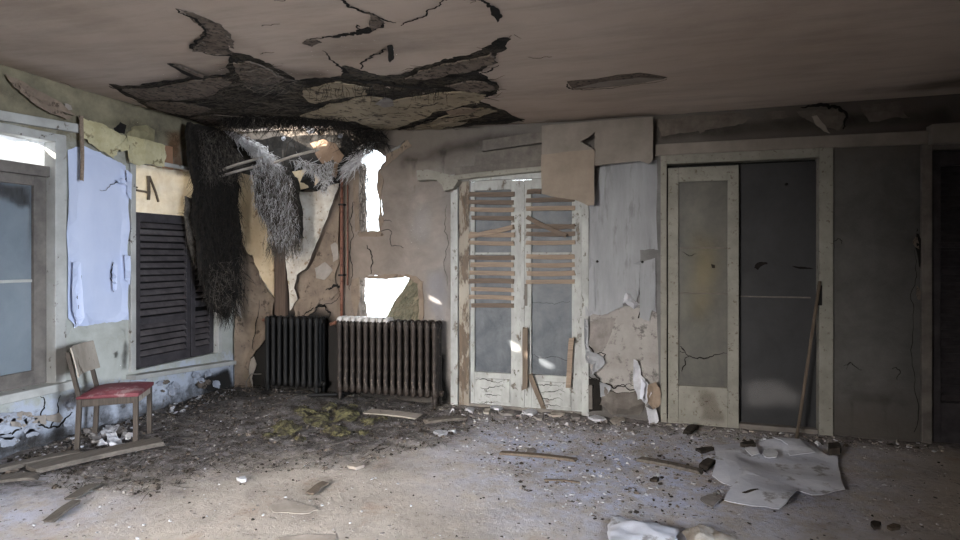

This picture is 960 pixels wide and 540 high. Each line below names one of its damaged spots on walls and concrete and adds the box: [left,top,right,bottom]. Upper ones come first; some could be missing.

crack [302,0,447,73]
crack [472,0,502,22]
spalling [109,8,525,237]
flaking render [766,103,848,133]
flaking render [293,206,424,321]
flaking render [234,244,274,388]
crack [0,395,73,436]
peeling [0,401,76,448]
spalling [439,306,944,452]
crack [680,346,724,370]